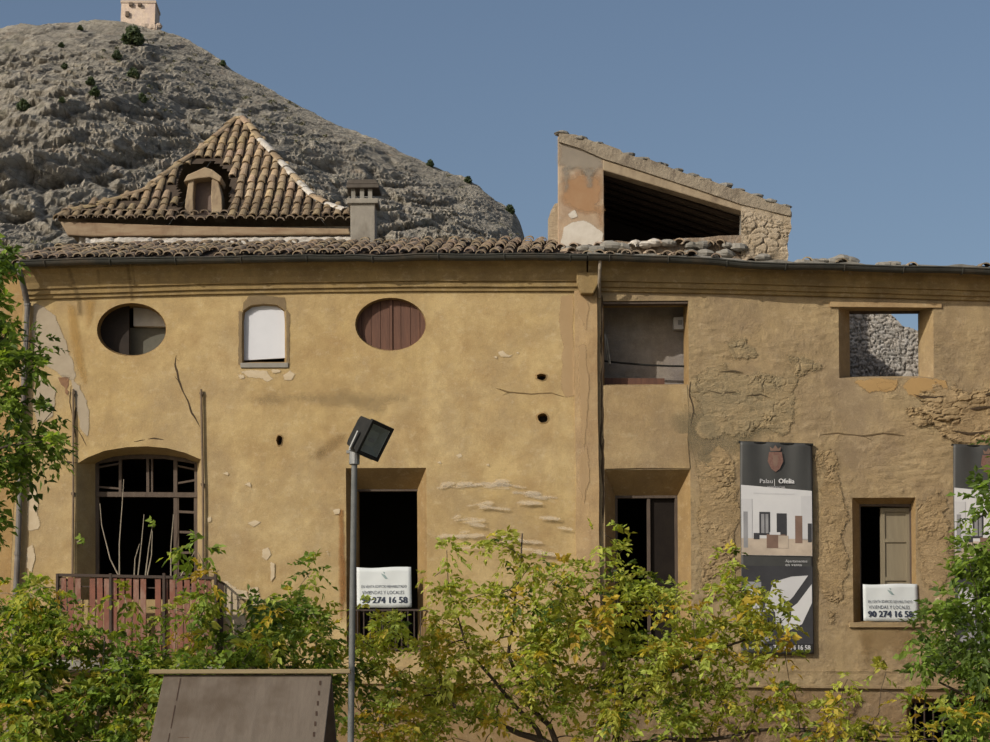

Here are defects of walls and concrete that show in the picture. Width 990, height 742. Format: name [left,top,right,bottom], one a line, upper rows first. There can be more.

peeling [32,303,89,436]
crack [174,358,199,425]
spalling [238,295,295,382]